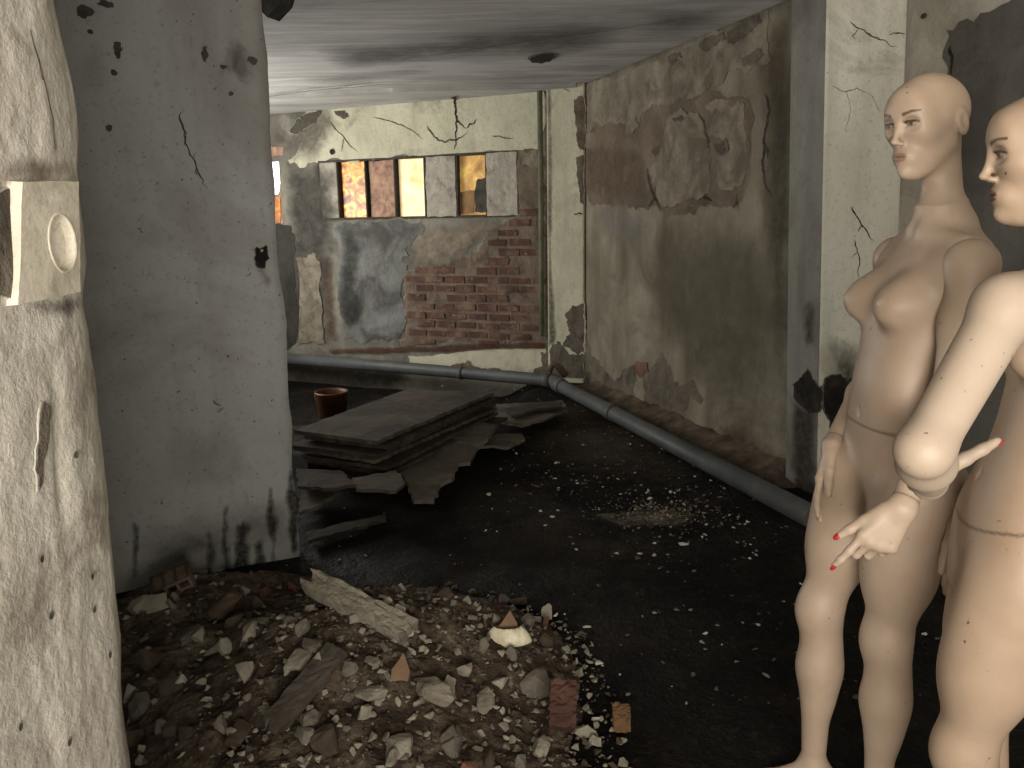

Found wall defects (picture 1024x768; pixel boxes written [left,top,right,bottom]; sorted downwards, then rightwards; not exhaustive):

crack [851,22,904,47]
crack [179,112,207,188]
crack [374,100,512,150]
peeling [573,10,771,217]
peeling [943,0,1024,273]
leakage [341,237,356,323]
flaking render [288,92,704,419]
crack [851,207,874,278]
peeling [958,371,1006,474]
leakage [178,524,264,574]
leakage [268,506,277,536]
leakage [287,474,297,551]